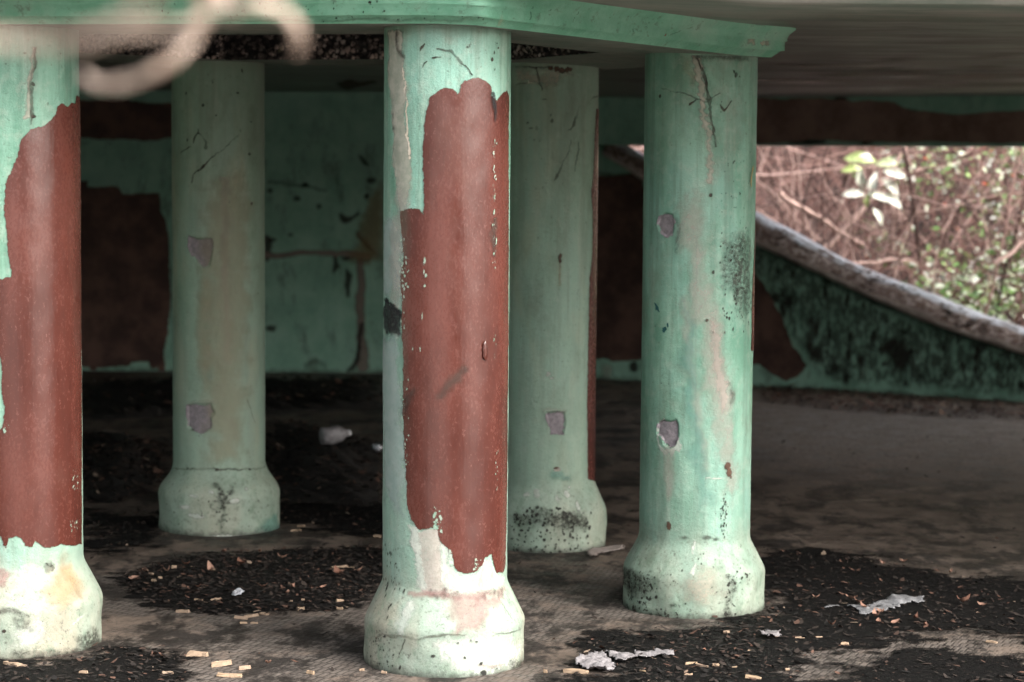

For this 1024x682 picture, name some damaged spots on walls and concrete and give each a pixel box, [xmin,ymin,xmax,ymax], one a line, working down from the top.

crack [184,81,252,183]
crack [659,56,740,197]
peeling [399,236,409,333]
water stain [712,233,1024,410]
spalling [545,411,565,435]
spalling [656,418,682,456]
peeling [408,507,504,596]
water stain [511,486,592,553]